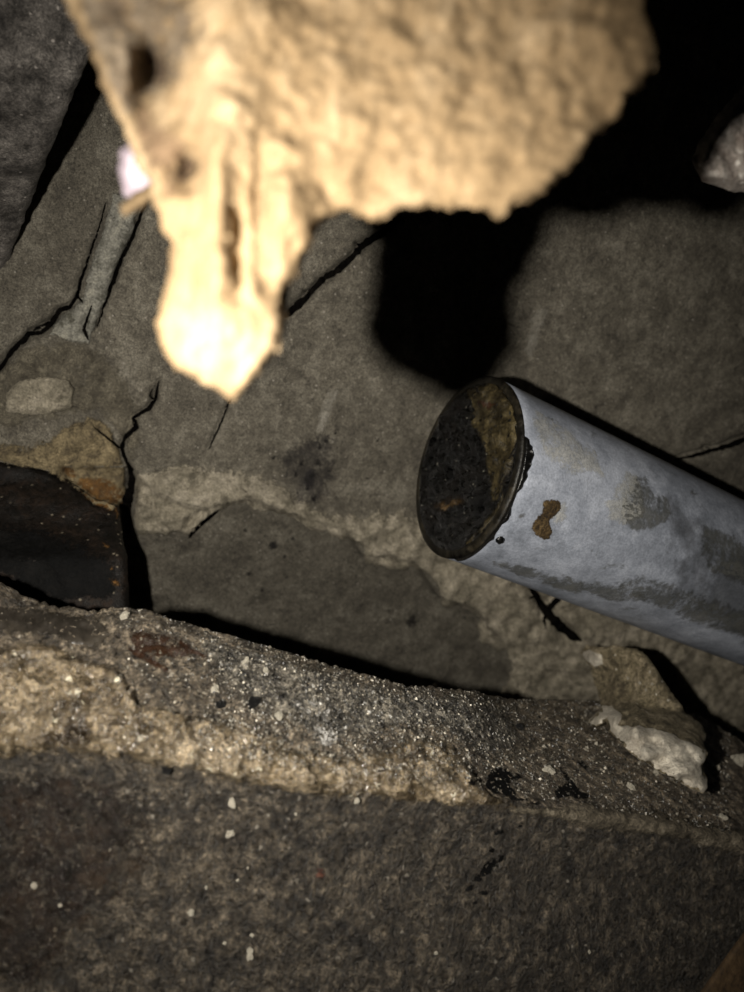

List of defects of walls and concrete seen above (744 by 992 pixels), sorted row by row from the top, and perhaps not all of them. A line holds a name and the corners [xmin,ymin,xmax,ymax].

crack [0,203,146,371]
crack [286,215,400,317]
crack [93,381,159,534]
crack [208,398,231,450]
corrosion [532,499,561,540]
crack [528,588,582,642]